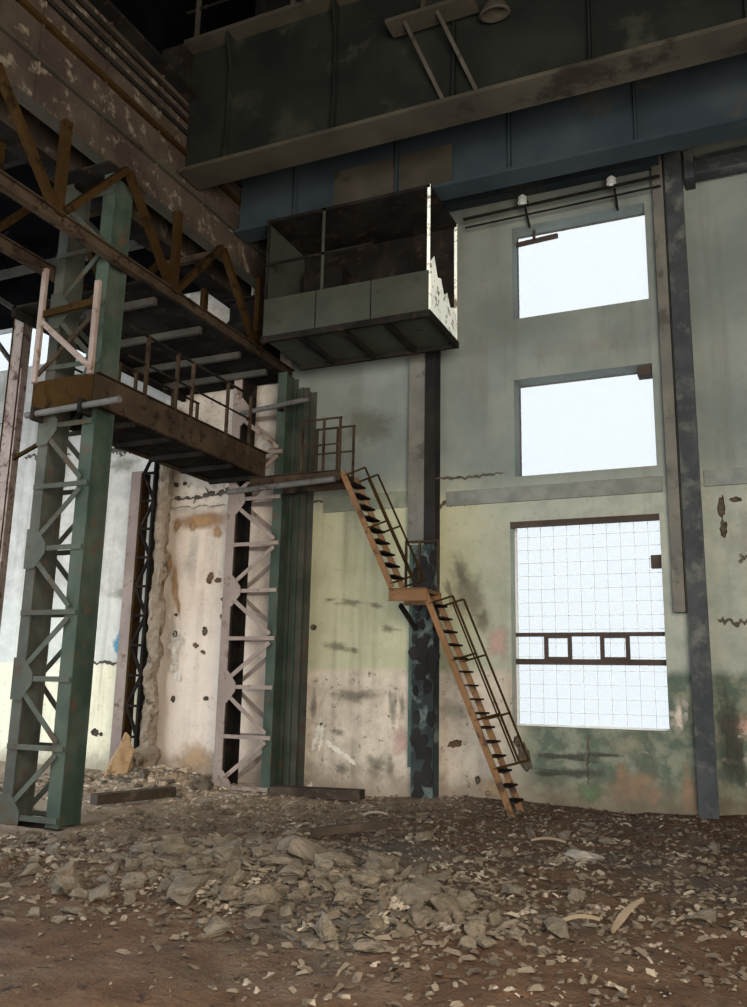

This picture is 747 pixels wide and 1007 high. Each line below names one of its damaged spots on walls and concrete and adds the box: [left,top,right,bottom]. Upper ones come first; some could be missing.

crack [436,472,504,509]
rust [174,513,222,537]
spalling [717,494,742,538]
crack [717,617,747,627]